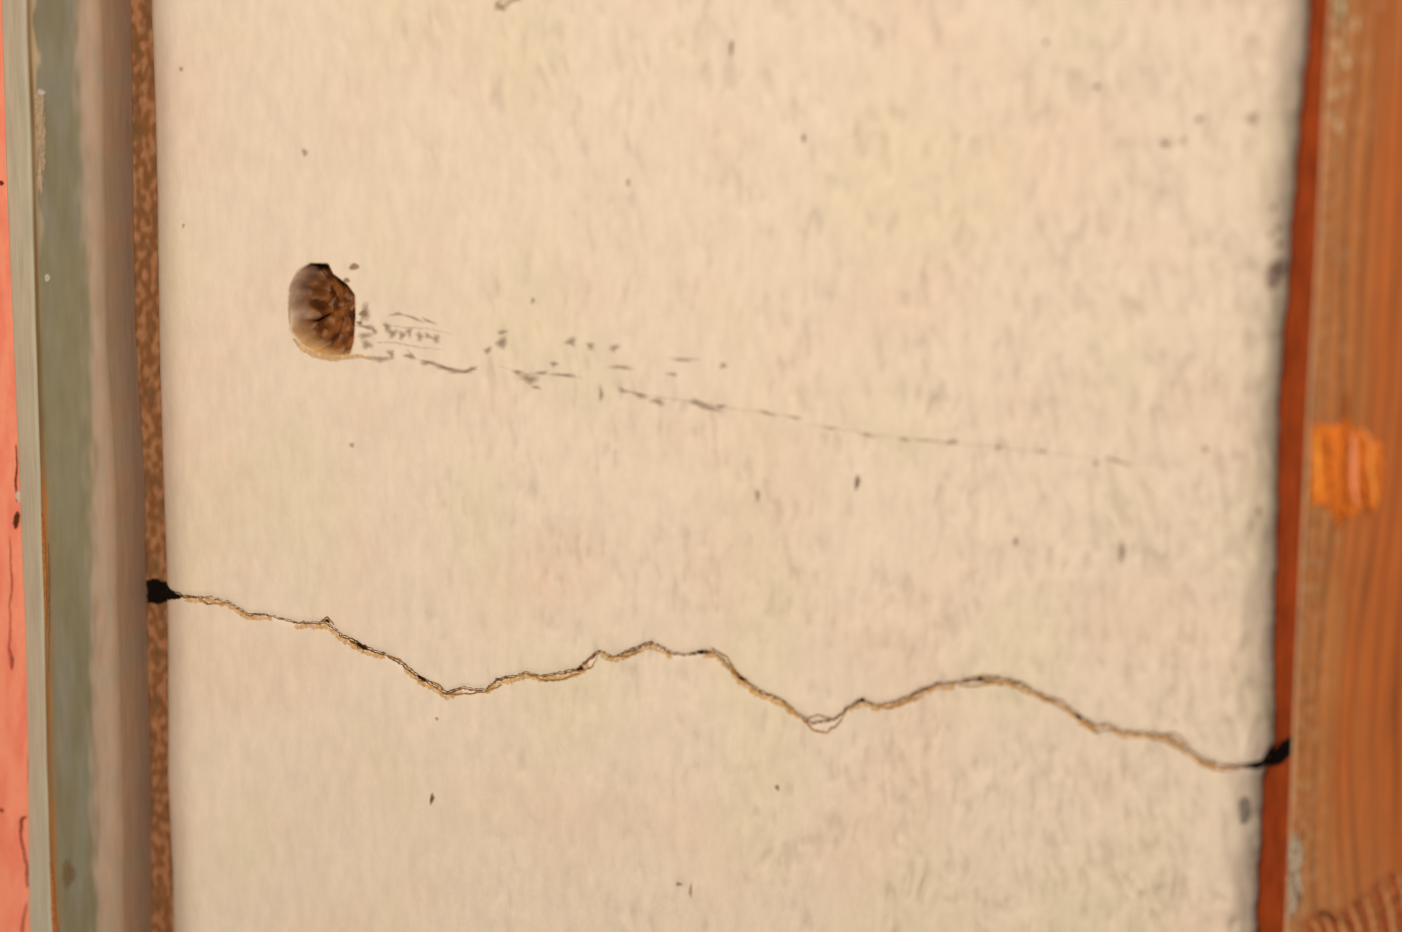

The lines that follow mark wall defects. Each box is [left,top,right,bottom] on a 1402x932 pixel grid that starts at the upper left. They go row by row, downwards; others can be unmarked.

crack [146,578,1293,771]